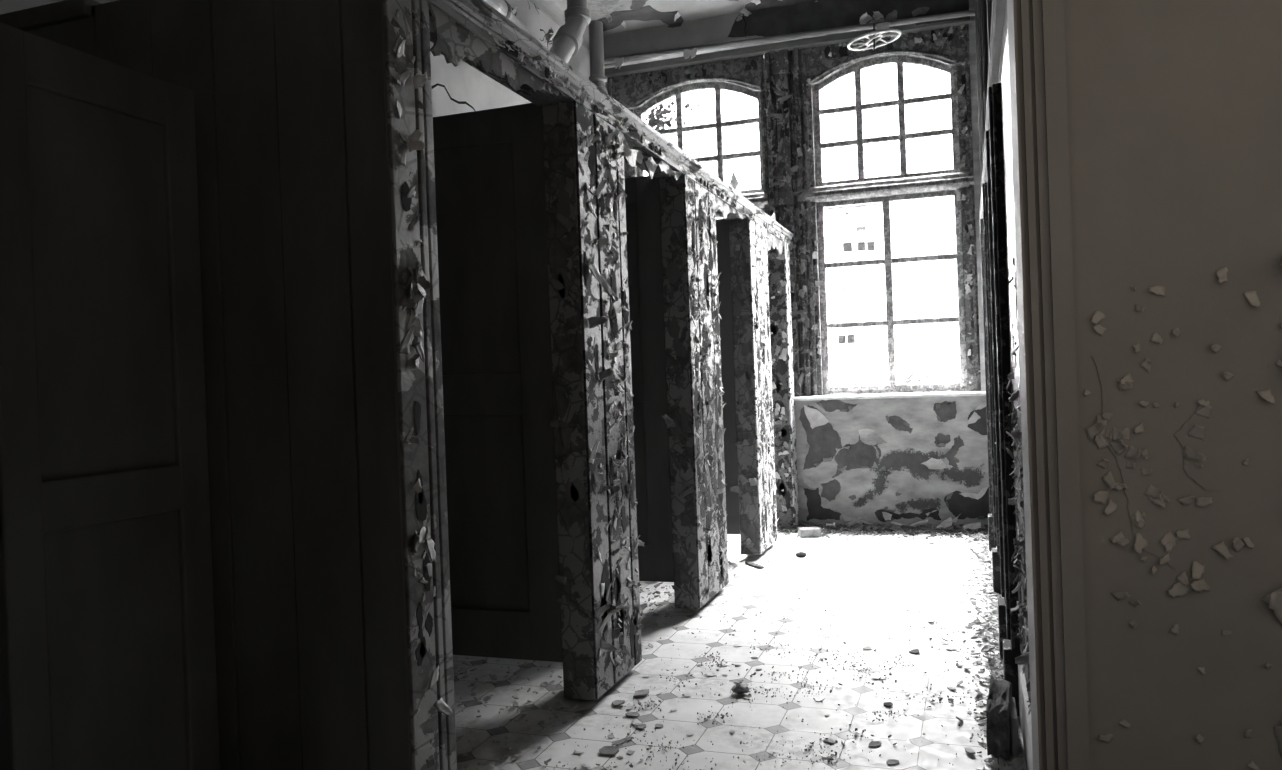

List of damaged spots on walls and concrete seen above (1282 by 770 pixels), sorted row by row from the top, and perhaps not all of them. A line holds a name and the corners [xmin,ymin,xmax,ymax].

peeling [391,8,428,119]
peeling [597,0,684,32]
peeling [728,0,970,61]
peeling [399,129,432,368]
peeling [488,18,992,673]
peeling [411,470,453,716]
flaking render [612,689,649,718]
peeling [921,233,1031,715]